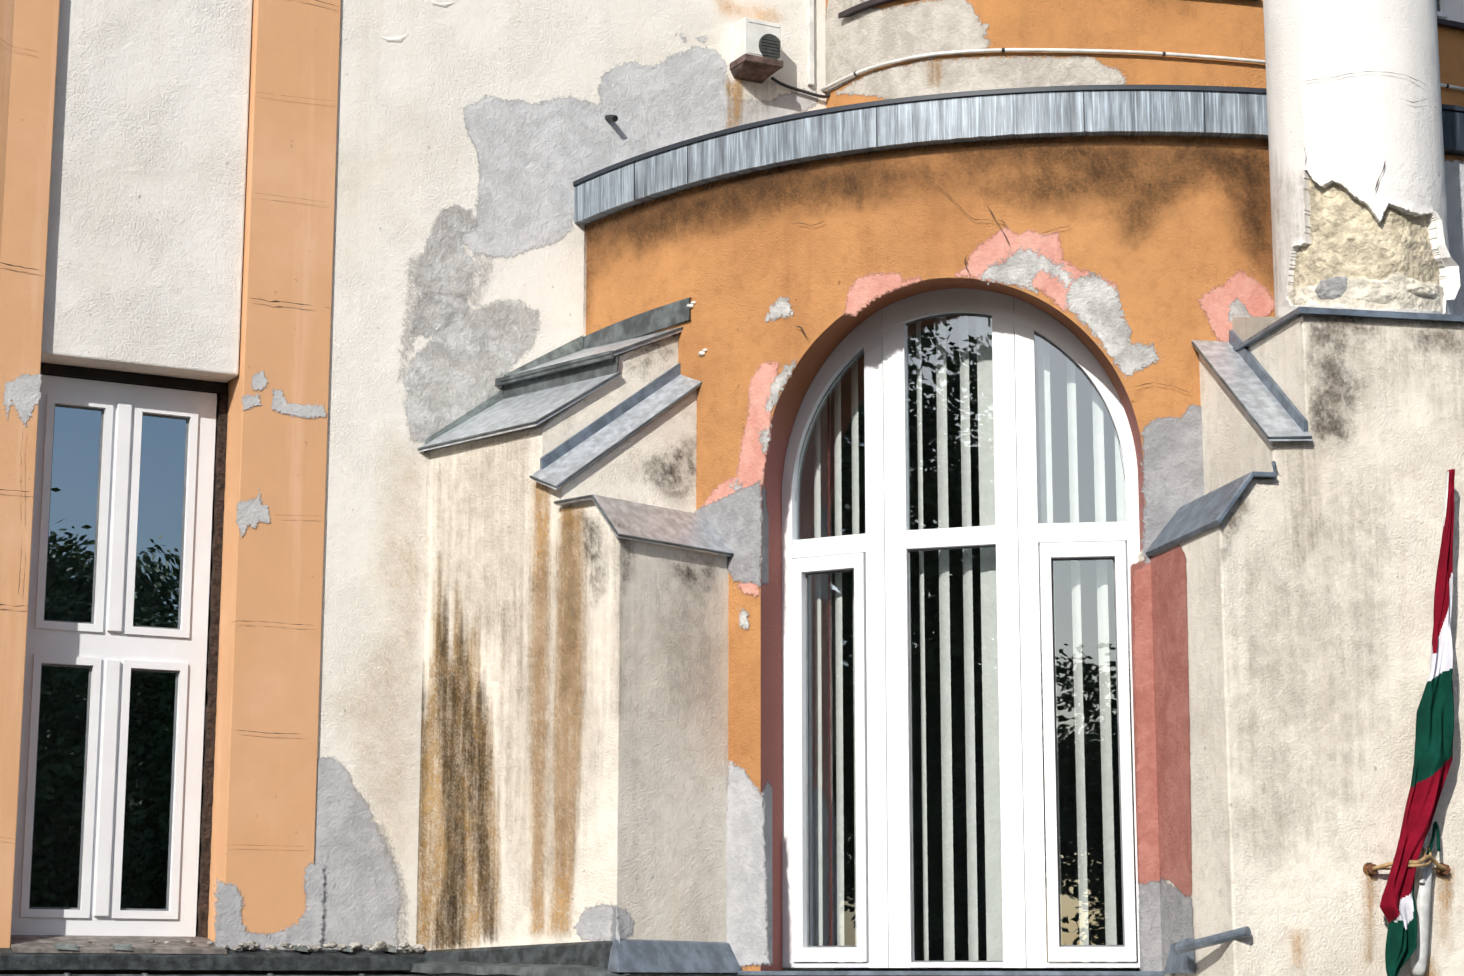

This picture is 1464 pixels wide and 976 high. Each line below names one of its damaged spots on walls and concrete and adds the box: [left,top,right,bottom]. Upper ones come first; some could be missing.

peeling [955,226,1119,312]
spalling [1198,170,1461,342]
peeling [3,373,42,427]
peeling [242,370,327,419]
peeling [701,359,797,507]
peeling [236,487,271,537]
damp [585,521,598,589]
peeling [737,581,760,629]
damp [416,575,499,949]
peeling [213,862,325,950]